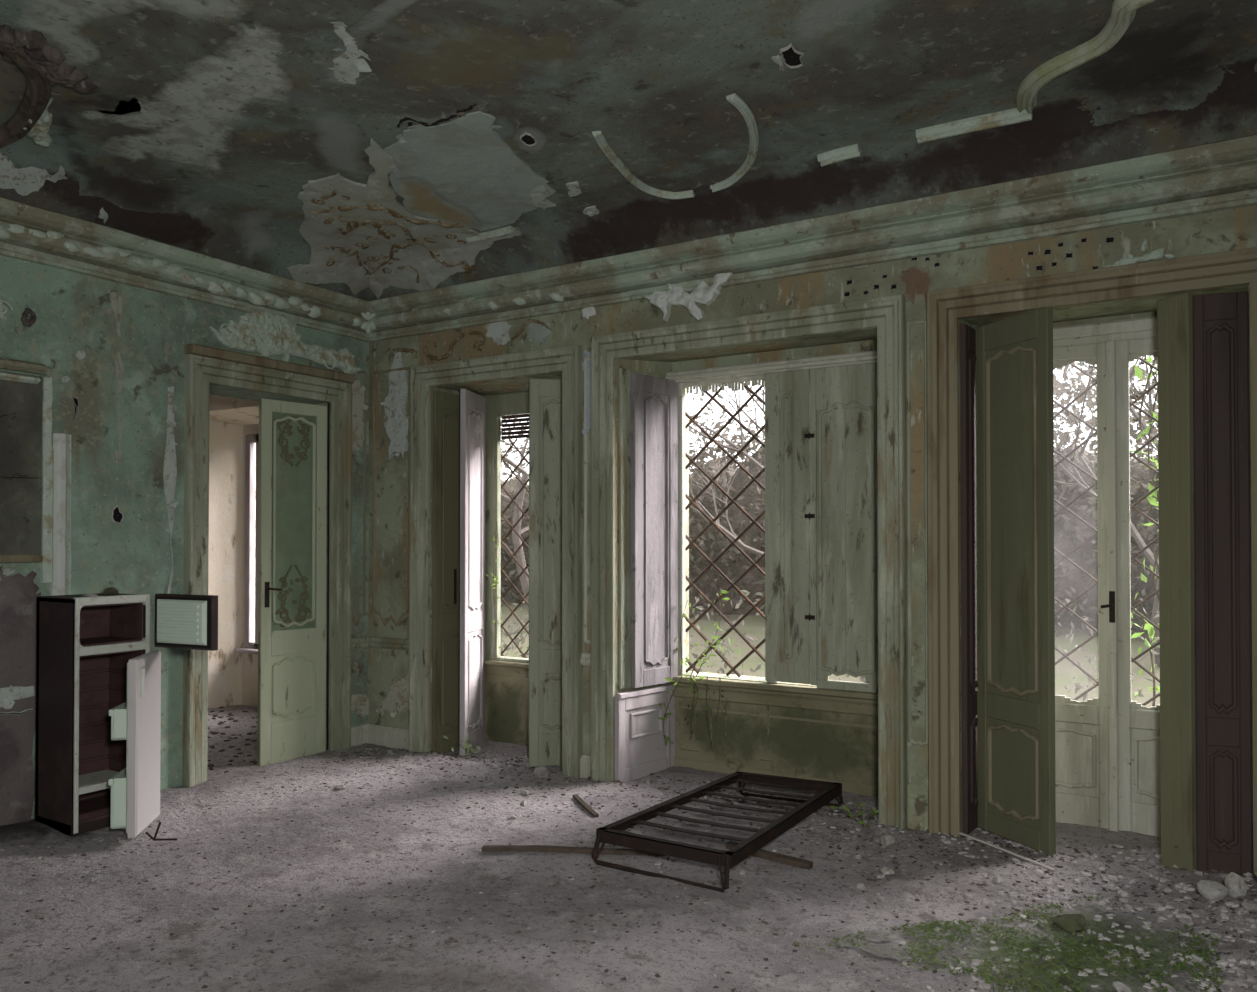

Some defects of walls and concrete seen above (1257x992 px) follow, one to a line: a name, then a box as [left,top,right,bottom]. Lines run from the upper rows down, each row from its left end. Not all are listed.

flaking render [328,22,372,85]
flaking render [0,153,68,196]
flaking render [384,111,599,231]
damp [555,8,1257,264]
peeling [352,352,410,460]
flaking render [0,566,41,826]